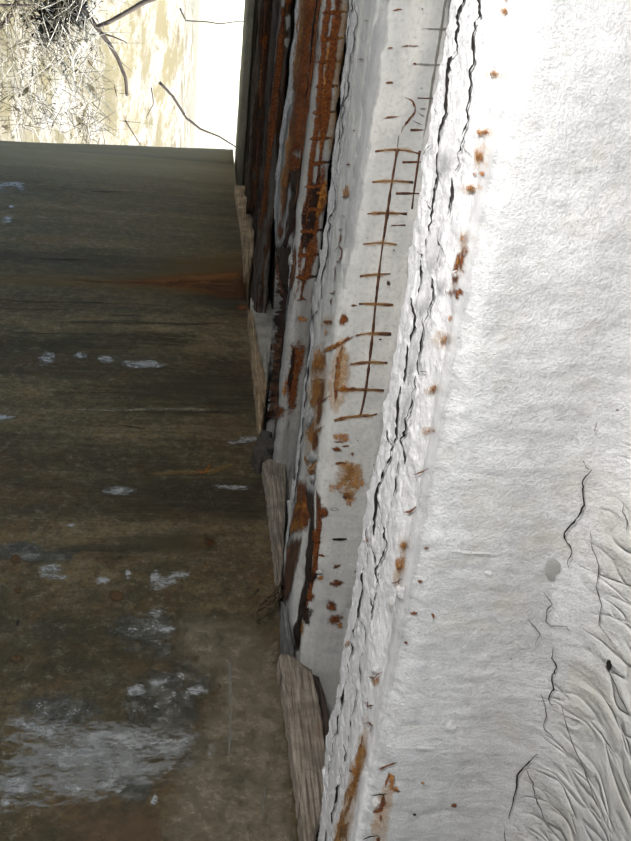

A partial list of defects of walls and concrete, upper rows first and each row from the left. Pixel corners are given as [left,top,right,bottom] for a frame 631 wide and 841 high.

rust [256,0,331,301]
rust [445,235,468,299]
rust [282,336,356,484]
rust [330,433,364,505]
crack [316,0,481,841]
crack [563,461,611,640]
leakage [2,777,29,804]
leakage [15,646,210,805]
rust [334,722,373,841]
rust [371,762,400,821]
crack [504,754,553,841]
crack [528,594,597,806]